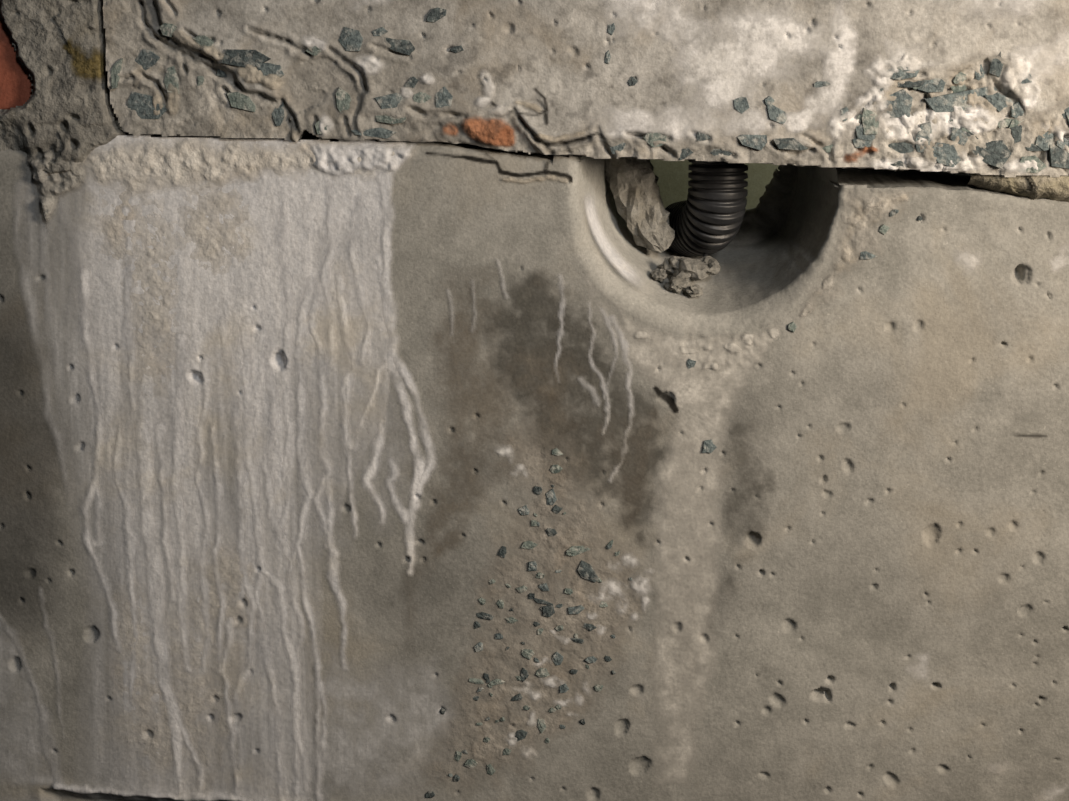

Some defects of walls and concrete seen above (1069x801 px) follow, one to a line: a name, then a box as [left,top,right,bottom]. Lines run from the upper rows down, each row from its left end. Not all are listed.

crack [427,89,605,183]
spalling [499,51,1069,177]
water stain [0,135,451,801]
water stain [448,274,765,780]